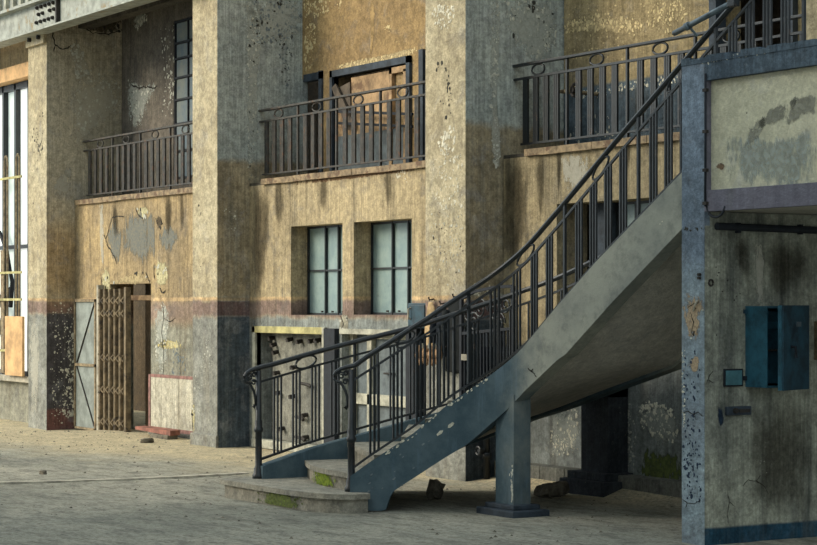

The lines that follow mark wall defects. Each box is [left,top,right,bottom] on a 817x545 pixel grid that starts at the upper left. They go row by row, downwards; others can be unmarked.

peeling [128,79,155,126]
water stain [558,155,587,186]
spalling [136,207,163,230]
water stain [508,176,521,253]
spalling [682,294,704,340]
peeling [50,302,74,424]
peeling [628,350,702,502]